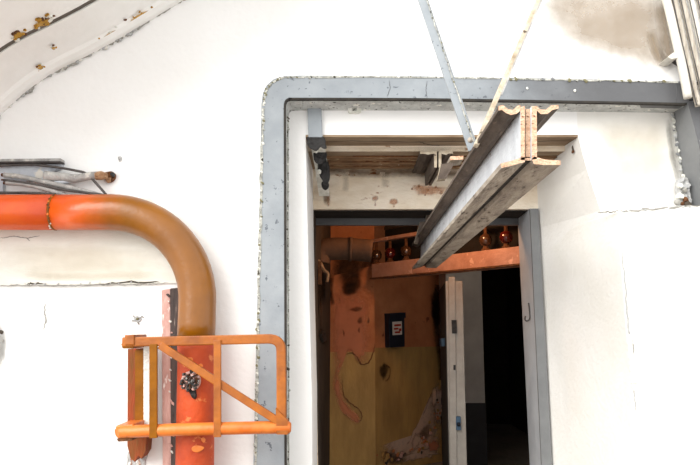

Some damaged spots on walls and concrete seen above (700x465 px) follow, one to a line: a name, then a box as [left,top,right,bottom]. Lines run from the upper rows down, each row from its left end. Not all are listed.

corrosion [11,13,55,42]
damp [553,0,673,61]
spalling [670,113,692,206]
crack [1,279,167,287]